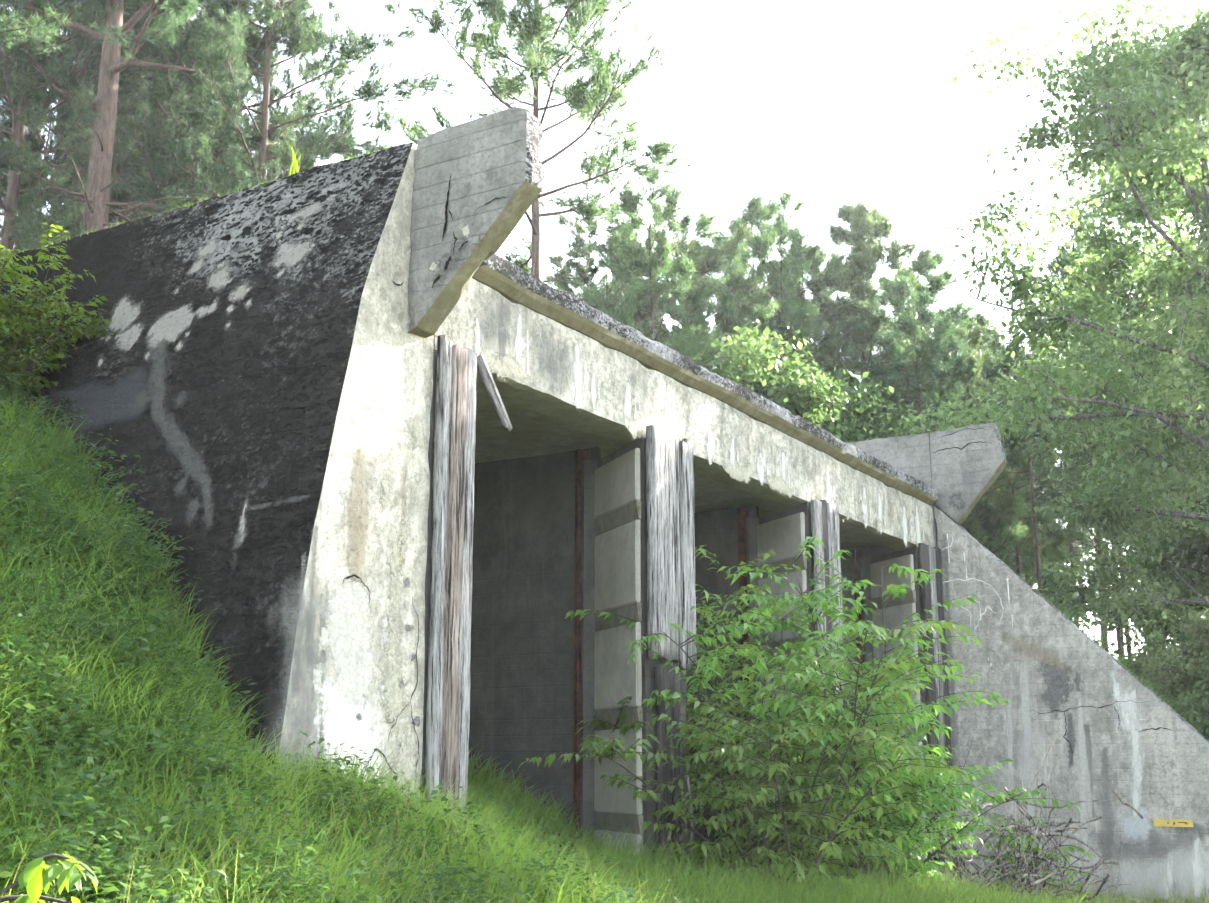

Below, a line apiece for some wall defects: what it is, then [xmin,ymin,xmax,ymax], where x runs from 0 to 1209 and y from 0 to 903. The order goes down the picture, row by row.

damp [475,304,600,409]
damp [624,382,637,428]
damp [707,425,739,467]
damp [757,451,790,485]
damp [862,487,886,532]
damp [901,503,925,546]
damp [270,528,379,790]
crack [362,588,420,802]
damp [1007,661,1049,860]
crack [1030,700,1171,758]
damp [1111,672,1144,818]
damp [1078,698,1204,870]